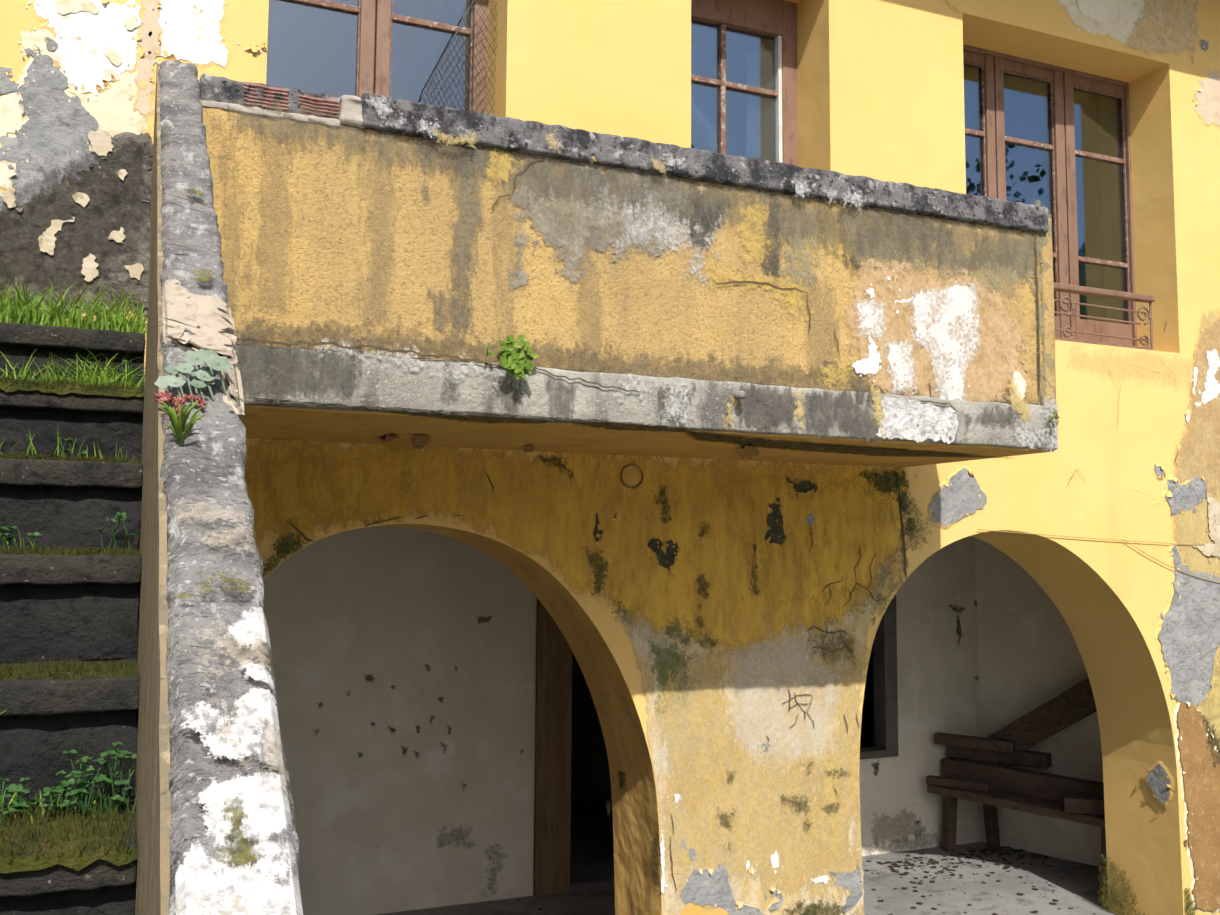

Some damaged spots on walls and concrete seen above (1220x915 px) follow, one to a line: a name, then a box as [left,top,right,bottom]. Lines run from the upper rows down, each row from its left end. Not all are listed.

peeling [1051,0,1171,47]
spalling [0,0,268,213]
peeling [1193,68,1220,130]
water stain [0,129,153,318]
crack [714,281,840,364]
peeling [852,270,980,444]
peeling [1185,349,1220,424]
water stain [228,100,1056,915]
spalling [925,465,988,530]
spalling [1142,463,1220,914]
spalling [660,833,784,915]
spalling [811,860,864,915]